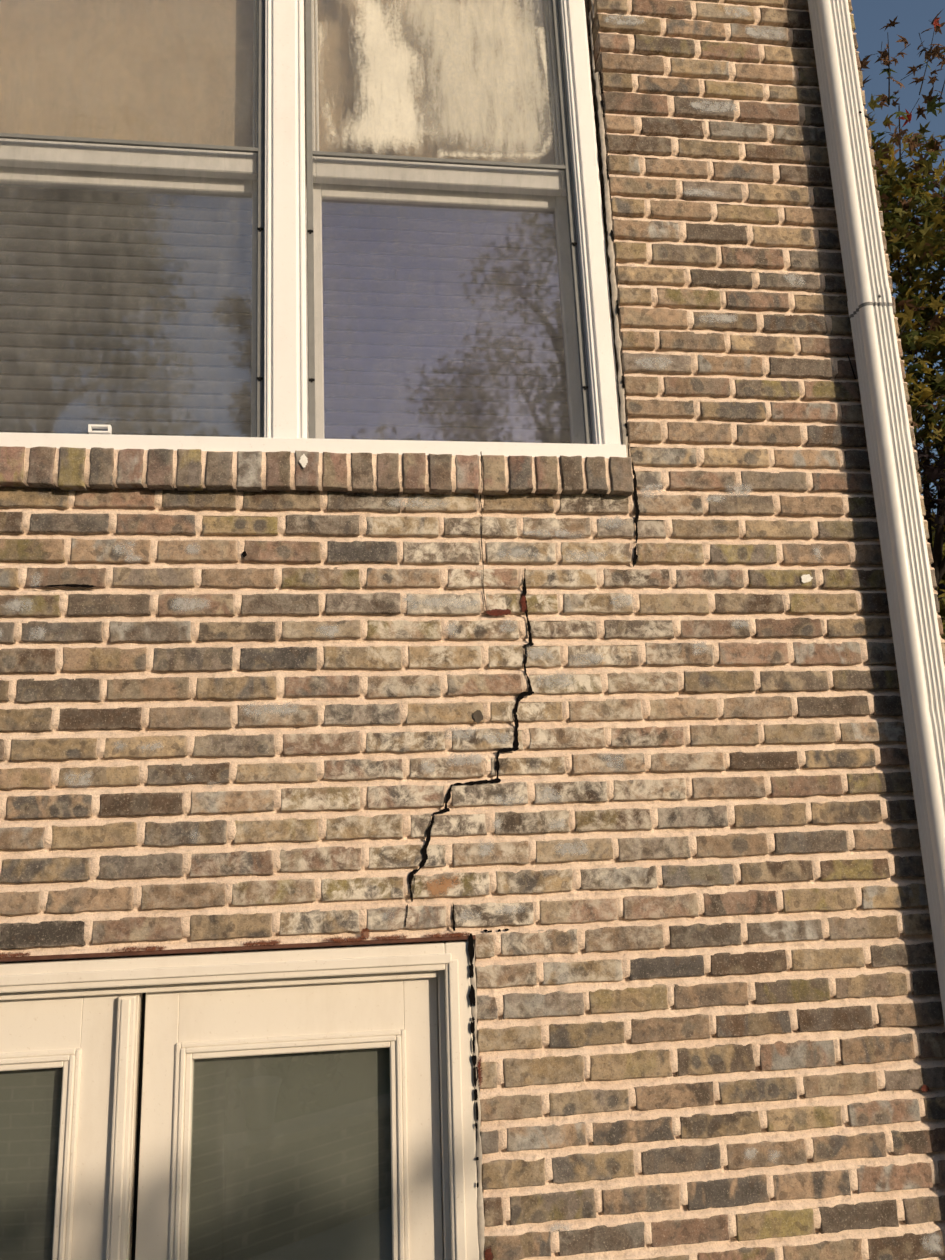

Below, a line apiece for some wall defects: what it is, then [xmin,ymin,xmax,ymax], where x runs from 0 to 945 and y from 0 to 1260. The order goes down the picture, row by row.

crack [479,452,487,611]
crack [631,460,640,567]
crack [405,569,534,927]